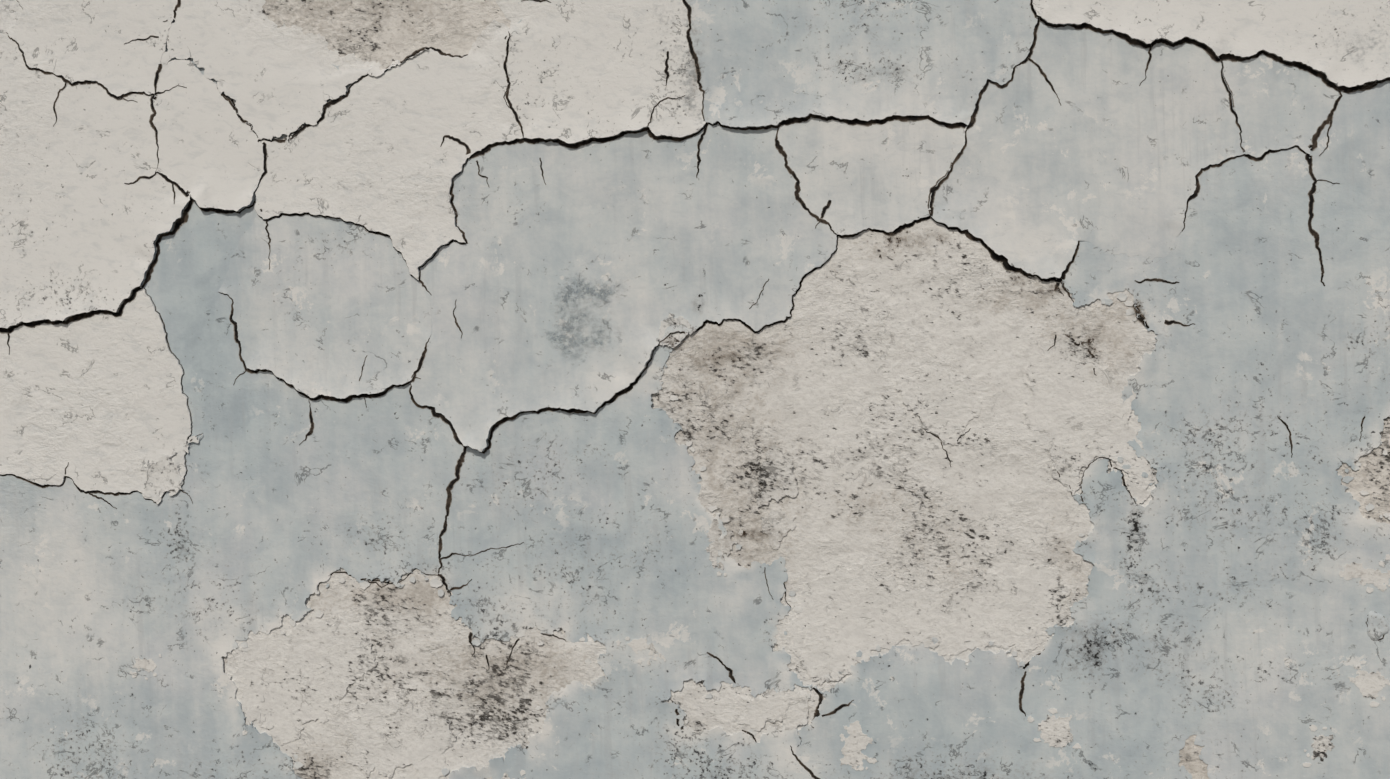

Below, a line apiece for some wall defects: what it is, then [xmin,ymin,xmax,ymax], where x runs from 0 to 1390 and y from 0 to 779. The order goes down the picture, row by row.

peeling [0,287,203,505]
peeling [0,0,837,452]
crack [0,0,1390,596]
spalling [656,0,1390,749]
spalling [225,568,606,779]
crack [764,562,791,607]
peeling [840,721,877,771]
spalling [1179,735,1209,779]
peeling [1303,724,1335,767]